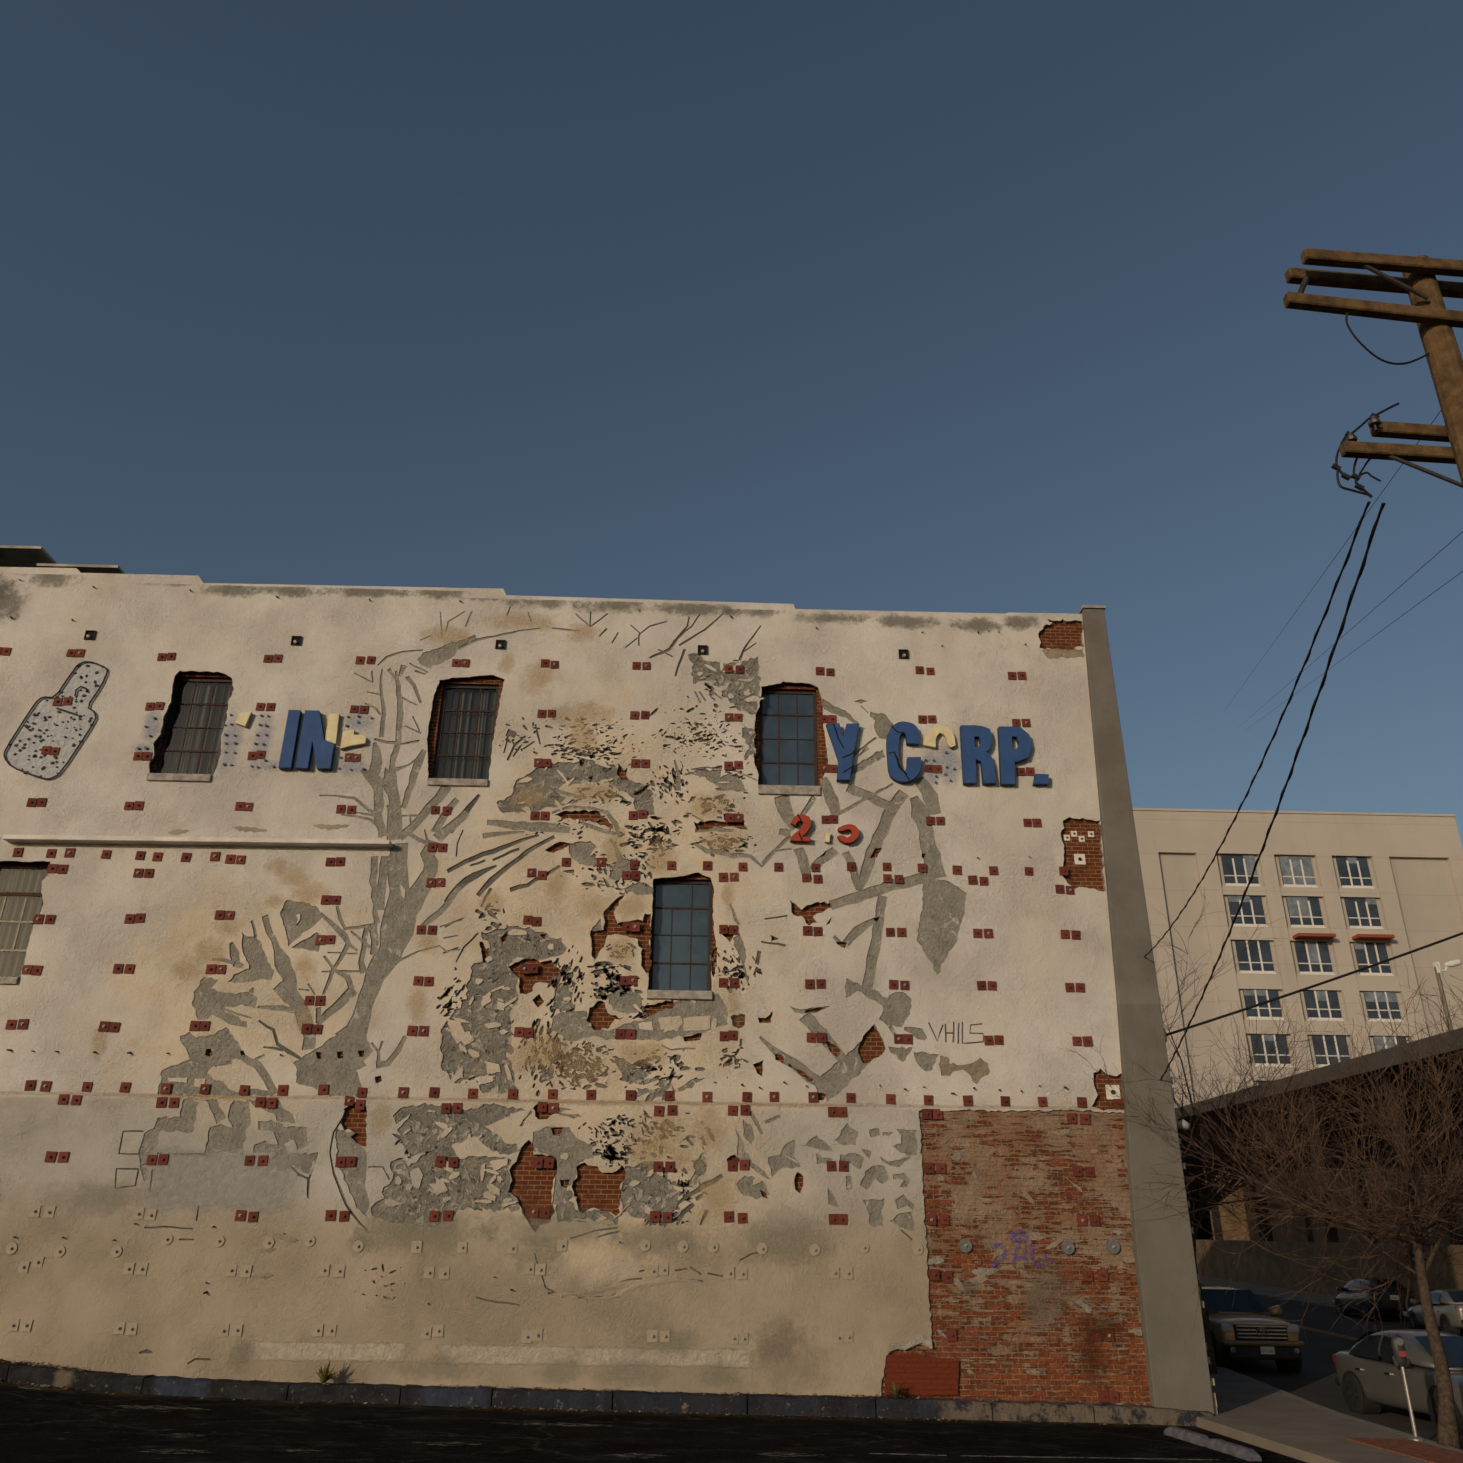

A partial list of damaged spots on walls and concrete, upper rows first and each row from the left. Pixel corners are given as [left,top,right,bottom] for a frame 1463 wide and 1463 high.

water stain [38,574,64,586]
flaking render [1038,620,1085,659]
flaking render [1061,818,1105,892]
peeling [139,611,990,1232]
flaking render [727,1069,1151,1406]